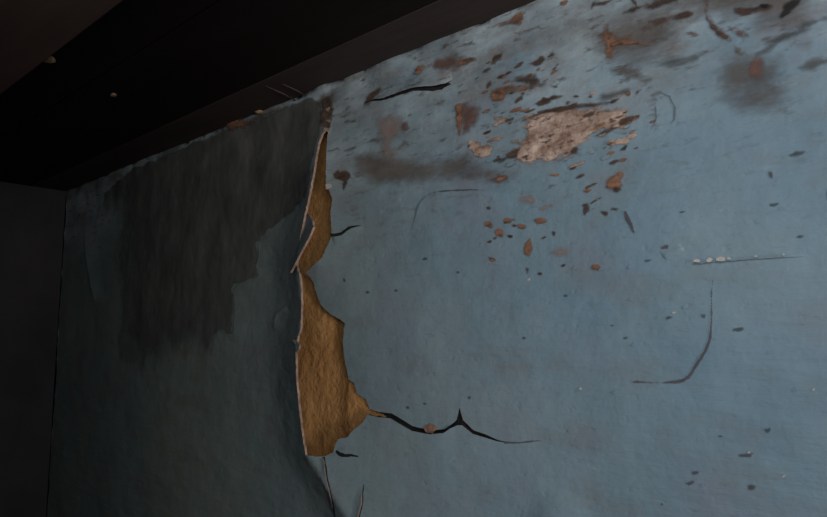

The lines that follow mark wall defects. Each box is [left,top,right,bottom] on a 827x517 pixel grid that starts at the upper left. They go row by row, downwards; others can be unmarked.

spalling [468,53,639,193]
crack [330,225,365,247]
spalling [484,205,550,243]
peeling [104,98,395,495]
crack [634,280,713,383]
crack [375,411,534,444]